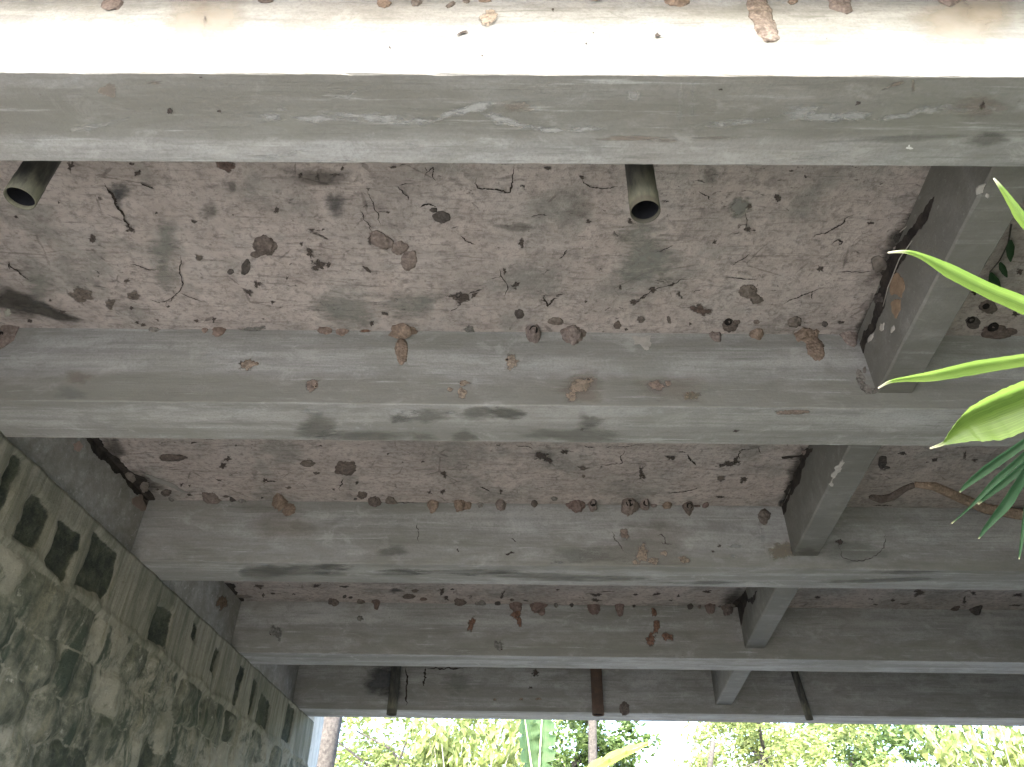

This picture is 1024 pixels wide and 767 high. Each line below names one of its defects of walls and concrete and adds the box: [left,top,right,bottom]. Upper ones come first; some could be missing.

crack [475,169,514,193]
crack [104,183,130,226]
crack [150,256,197,303]
leakage [0,289,79,322]
spalling [86,438,159,511]
leakage [248,565,338,576]
leakage [366,666,400,695]